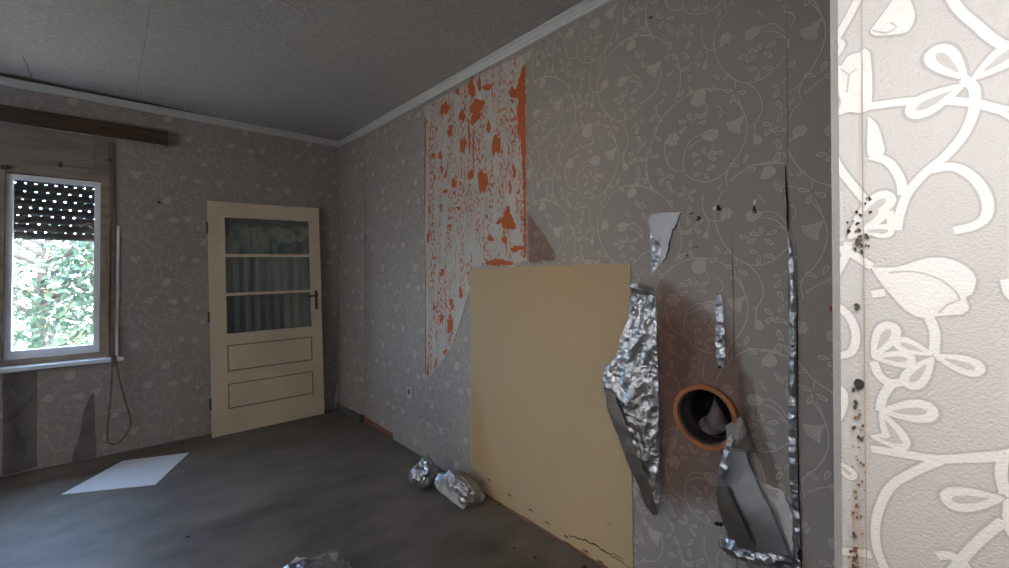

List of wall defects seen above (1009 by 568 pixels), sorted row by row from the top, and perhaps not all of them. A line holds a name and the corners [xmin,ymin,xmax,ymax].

peeling [424,53,634,568]
leakage [846,197,872,257]